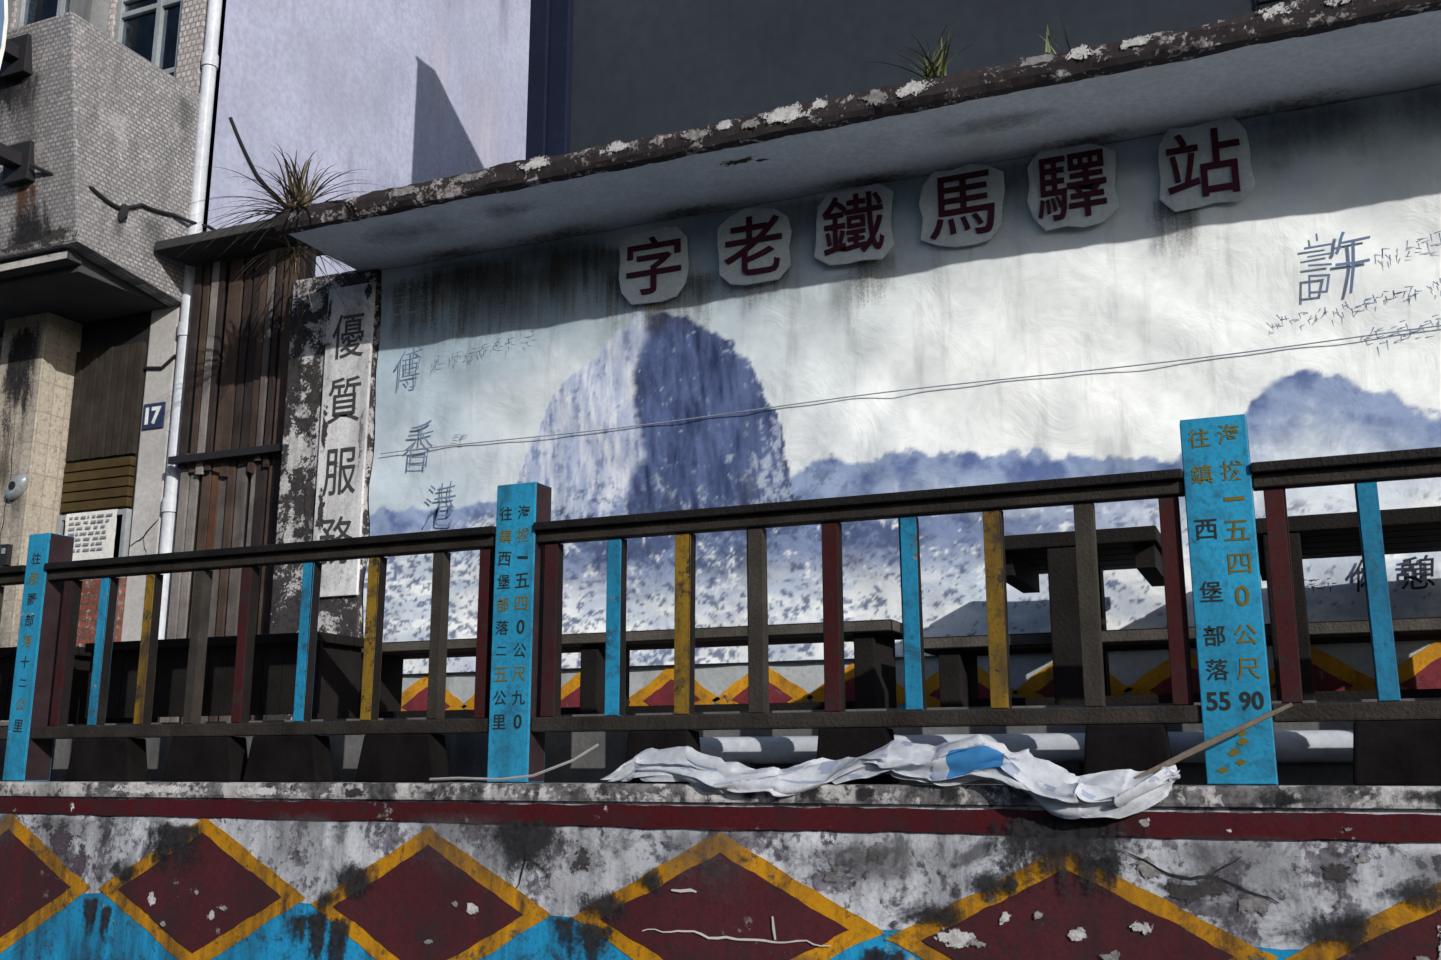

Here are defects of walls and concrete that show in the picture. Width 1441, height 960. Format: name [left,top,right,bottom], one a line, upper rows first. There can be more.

water stain [0,71,37,114]
water stain [858,260,881,294]
water stain [0,326,39,485]
peeling [283,291,332,543]
peeling [111,784,201,795]
peeling [234,785,296,797]
peeling [43,803,87,878]
spalling [1131,856,1274,916]
peeling [452,901,479,914]
peeling [934,927,991,949]
peeling [1067,927,1087,941]
peeling [1129,922,1153,935]